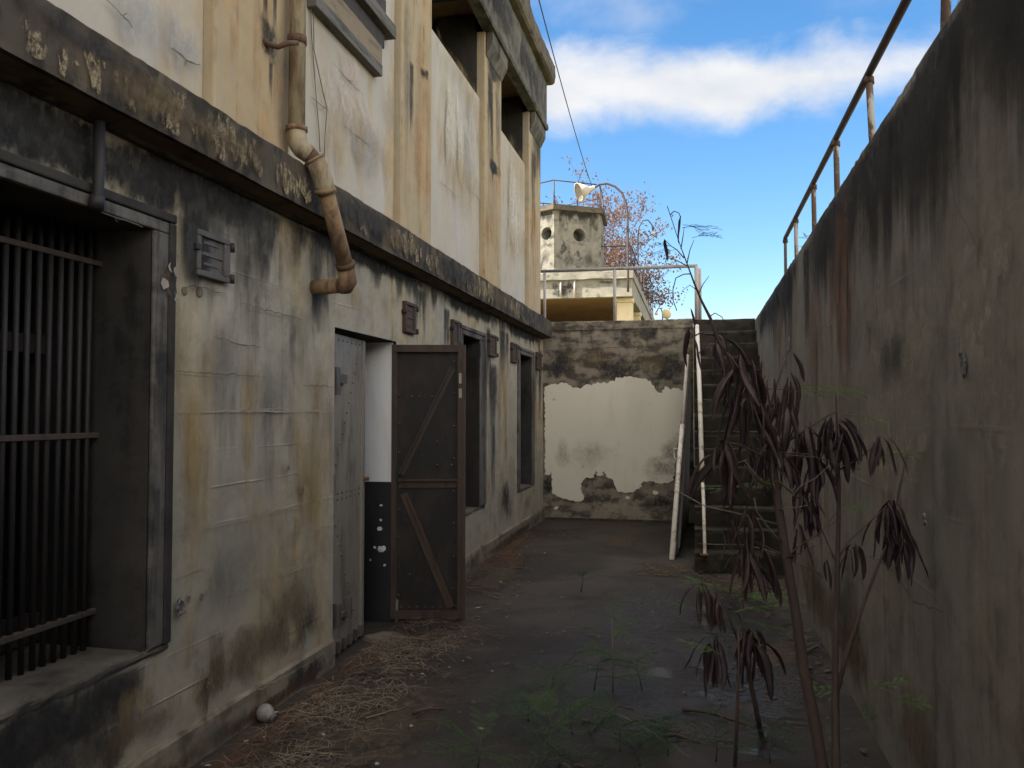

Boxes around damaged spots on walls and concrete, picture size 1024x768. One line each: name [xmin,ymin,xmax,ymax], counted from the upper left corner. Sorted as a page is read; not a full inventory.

peeling [22,21,46,59]
peeling [59,49,186,135]
water stain [488,62,500,144]
water stain [0,80,280,281]
peeling [193,115,263,176]
peeling [276,163,312,204]
water stain [532,139,540,190]
water stain [758,0,1007,336]
spalling [161,262,179,303]
water stain [349,247,568,469]
peeling [544,376,683,509]
rust [232,672,317,733]